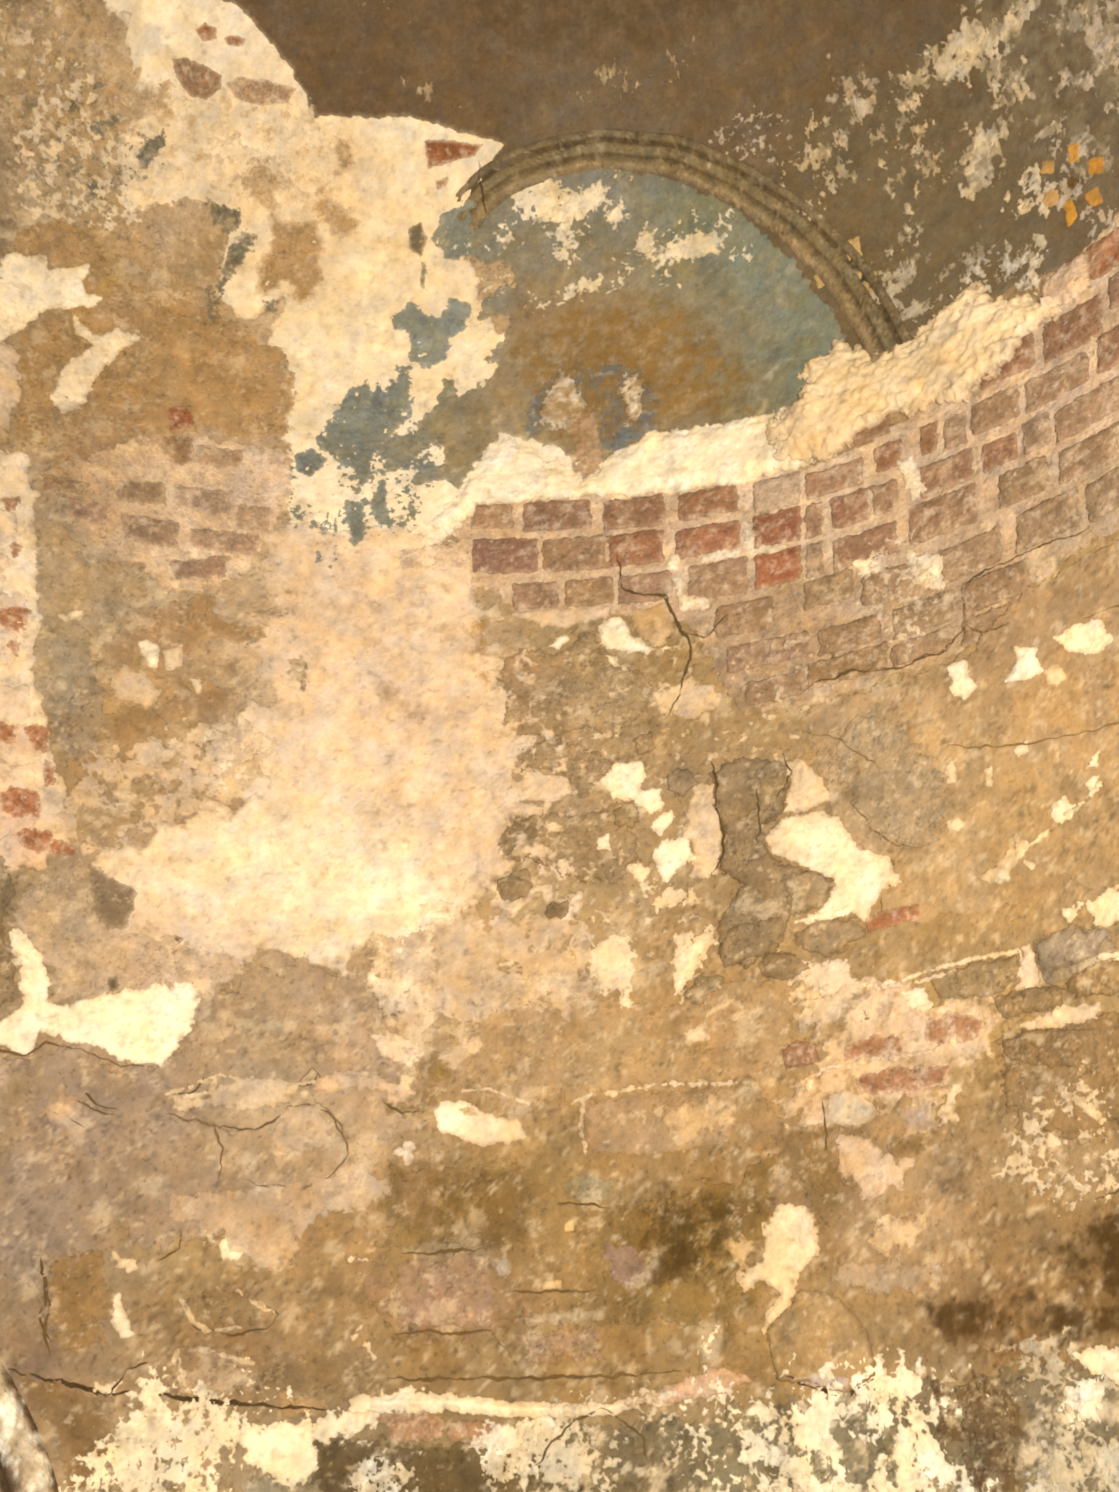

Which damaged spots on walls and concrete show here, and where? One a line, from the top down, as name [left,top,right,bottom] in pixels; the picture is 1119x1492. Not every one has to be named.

flaking render [0,0,1119,1177]
crack [616,552,728,714]
crack [800,623,1008,691]
crack [711,731,883,877]
crack [0,1041,349,1190]
flaking render [112,1251,138,1273]
crack [386,1329,681,1466]
flaking render [542,1280,562,1290]
flaking render [564,1205,579,1232]
peeling [58,1286,1119,1492]
water stain [928,1303,992,1340]
water stain [1051,1215,1119,1345]